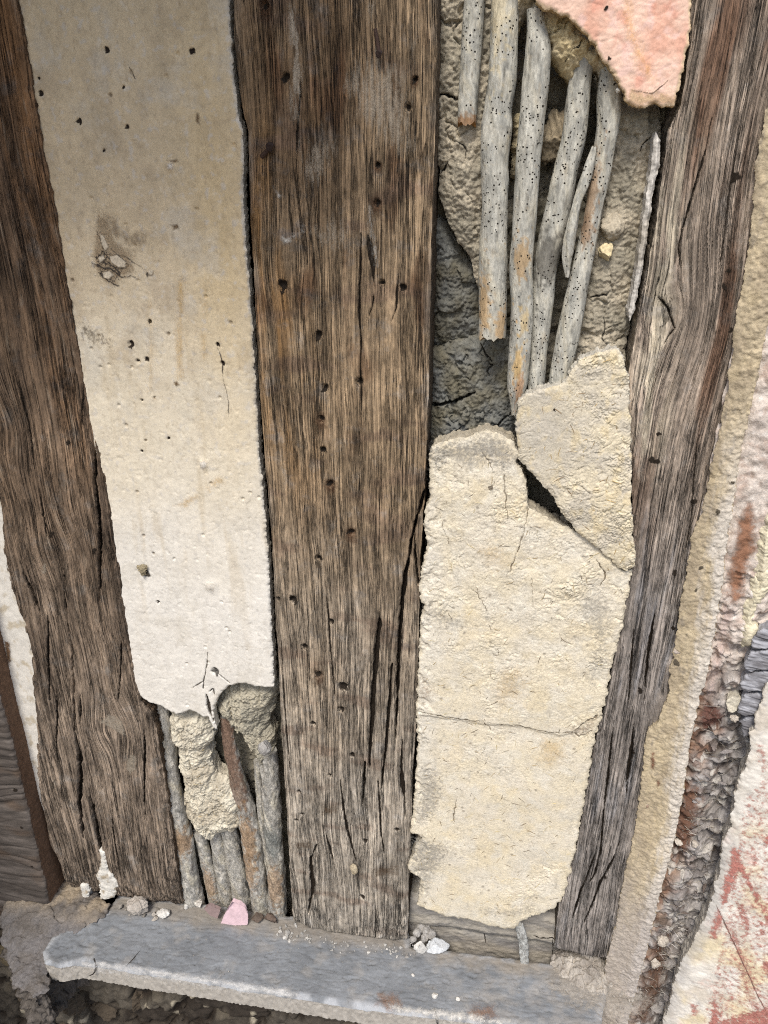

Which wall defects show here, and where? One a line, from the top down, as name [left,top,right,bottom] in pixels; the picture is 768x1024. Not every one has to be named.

peeling [629,90,674,106]
crack [308,488,634,922]